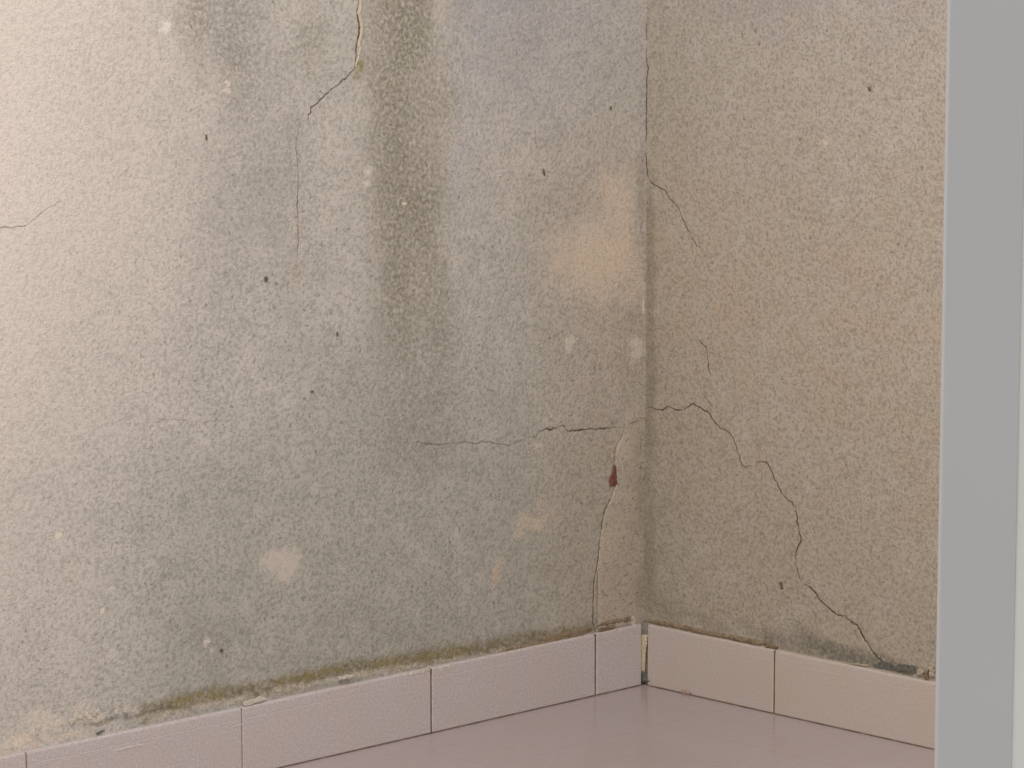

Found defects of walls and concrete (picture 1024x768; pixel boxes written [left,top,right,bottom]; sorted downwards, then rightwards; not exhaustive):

crack [308,0,365,119]
crack [646,29,701,248]
crack [544,340,885,663]